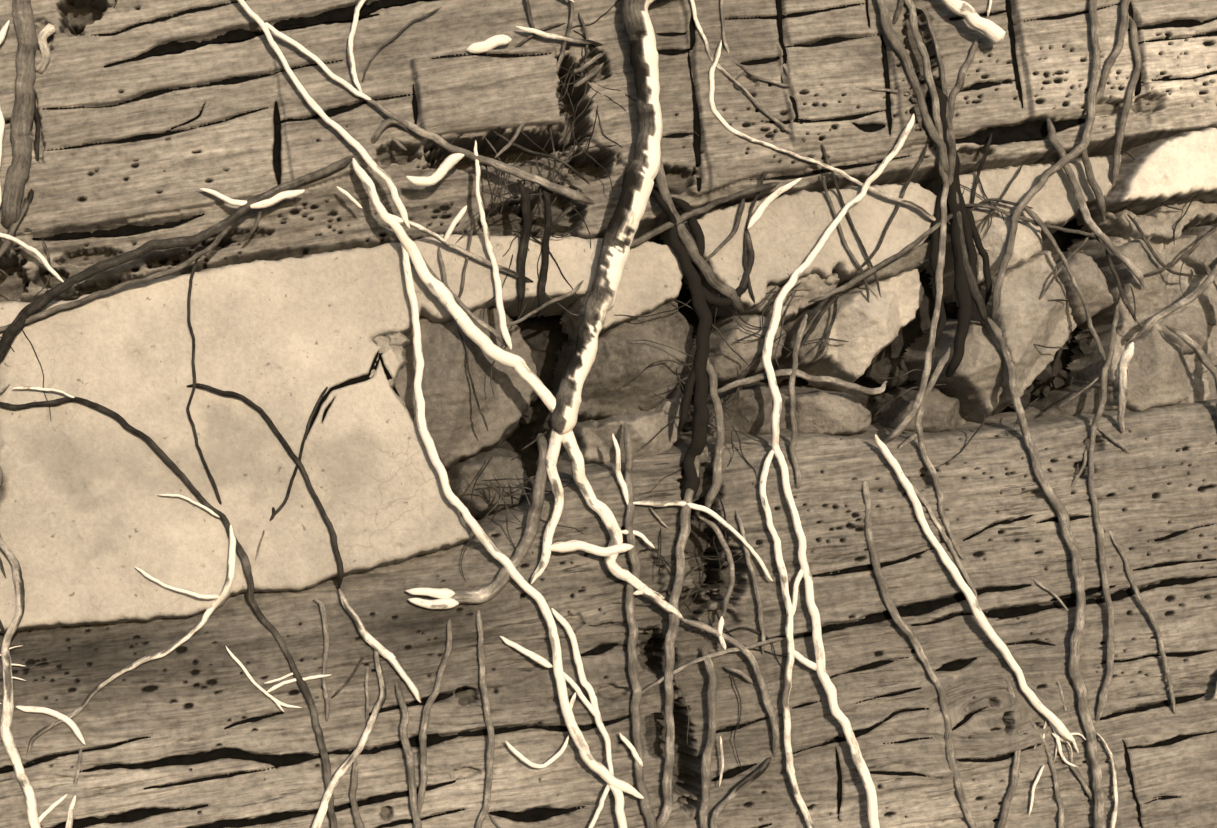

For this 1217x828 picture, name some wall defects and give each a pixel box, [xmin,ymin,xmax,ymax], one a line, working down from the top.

crack [91,0,418,68]
crack [431,51,552,59]
crack [42,60,413,151]
crack [306,351,400,439]
crack [758,524,1217,646]
crack [1101,650,1217,664]
crack [0,712,631,828]
crack [368,687,470,716]
crack [711,763,757,782]
crack [716,657,1041,779]
crack [1099,693,1205,721]
crack [1125,731,1217,749]